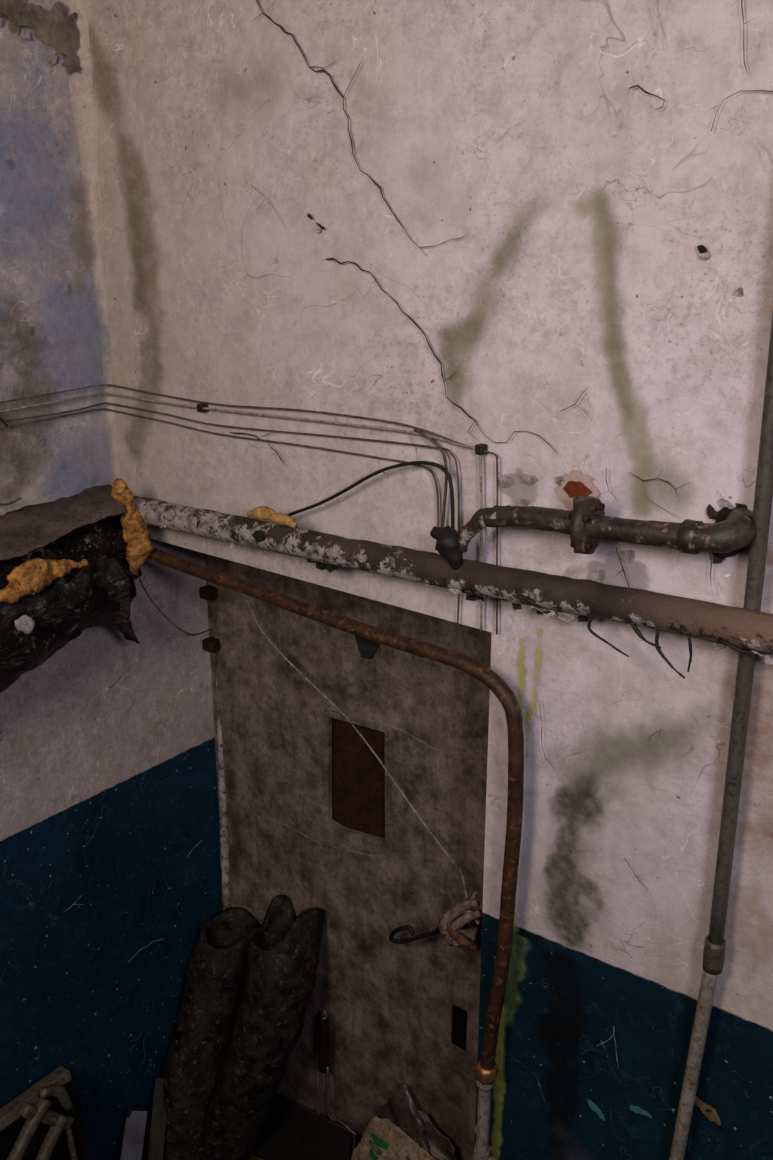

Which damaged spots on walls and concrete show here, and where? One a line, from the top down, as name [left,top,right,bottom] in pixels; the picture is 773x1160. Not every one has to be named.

peeling [0,0,81,75]
crack [254,0,466,254]
crack [627,85,665,110]
crack [711,0,773,131]
crack [326,258,555,451]